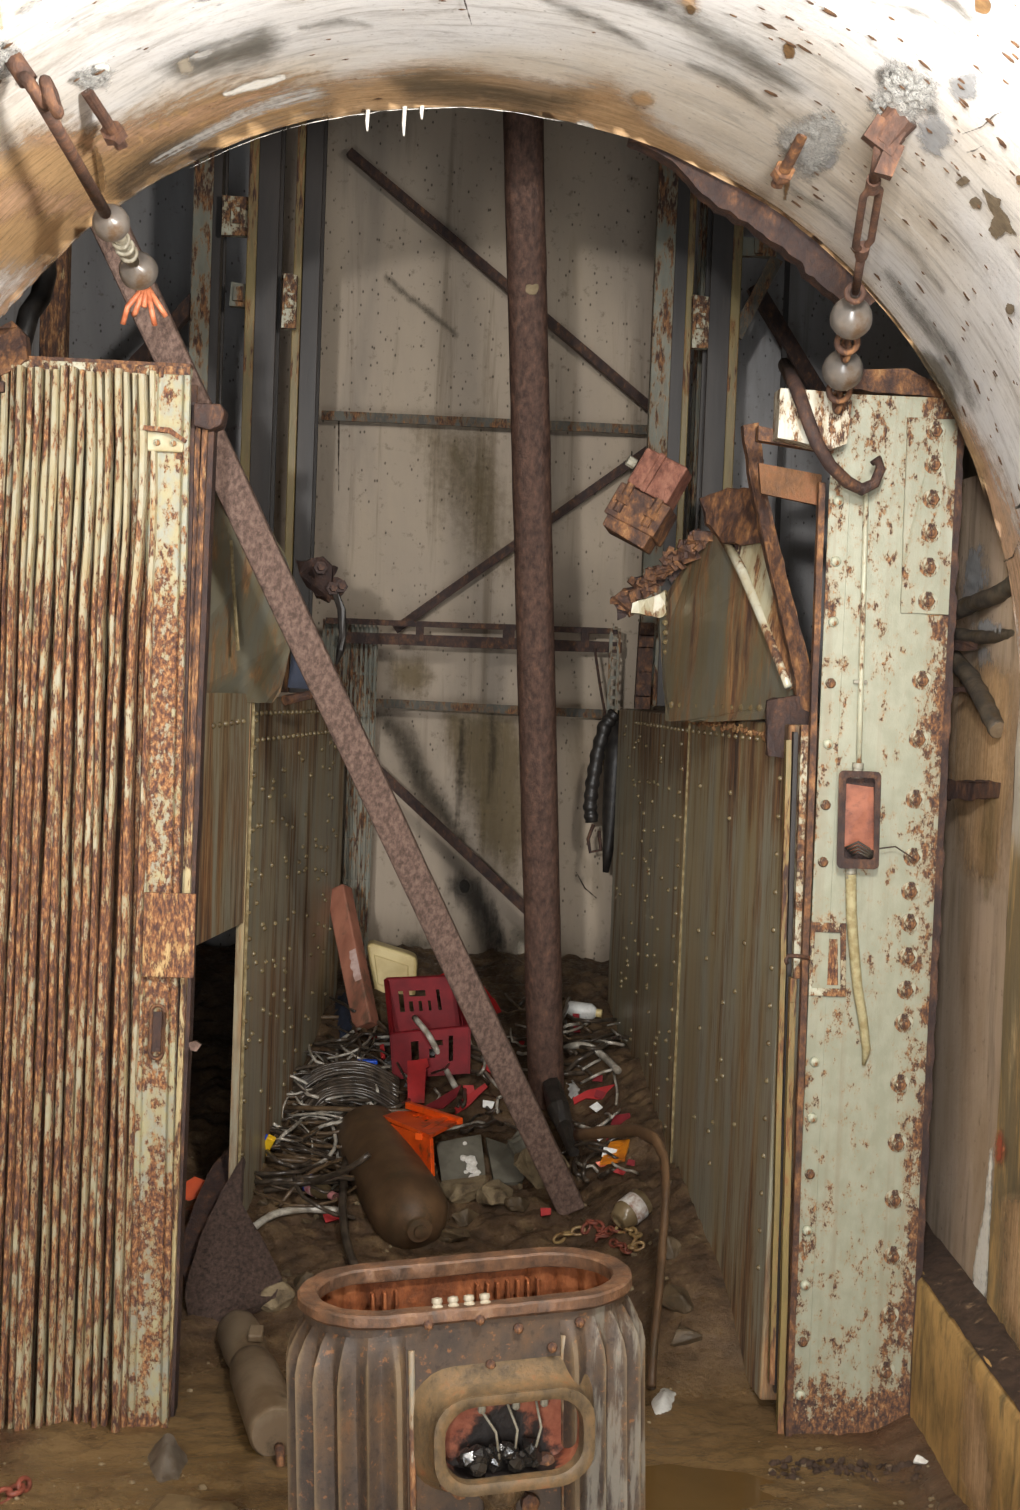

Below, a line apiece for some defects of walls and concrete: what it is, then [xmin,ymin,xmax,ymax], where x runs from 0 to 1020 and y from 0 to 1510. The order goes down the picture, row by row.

spalling [0,14,21,80]
corrosion [757,6,821,65]
corrosion [806,0,877,47]
corrosion [974,0,991,14]
spalling [868,61,982,156]
corrosion [952,64,980,143]
spalling [776,111,847,182]
corrosion [784,172,825,208]
damp [0,32,1020,659]
damp [449,715,521,864]